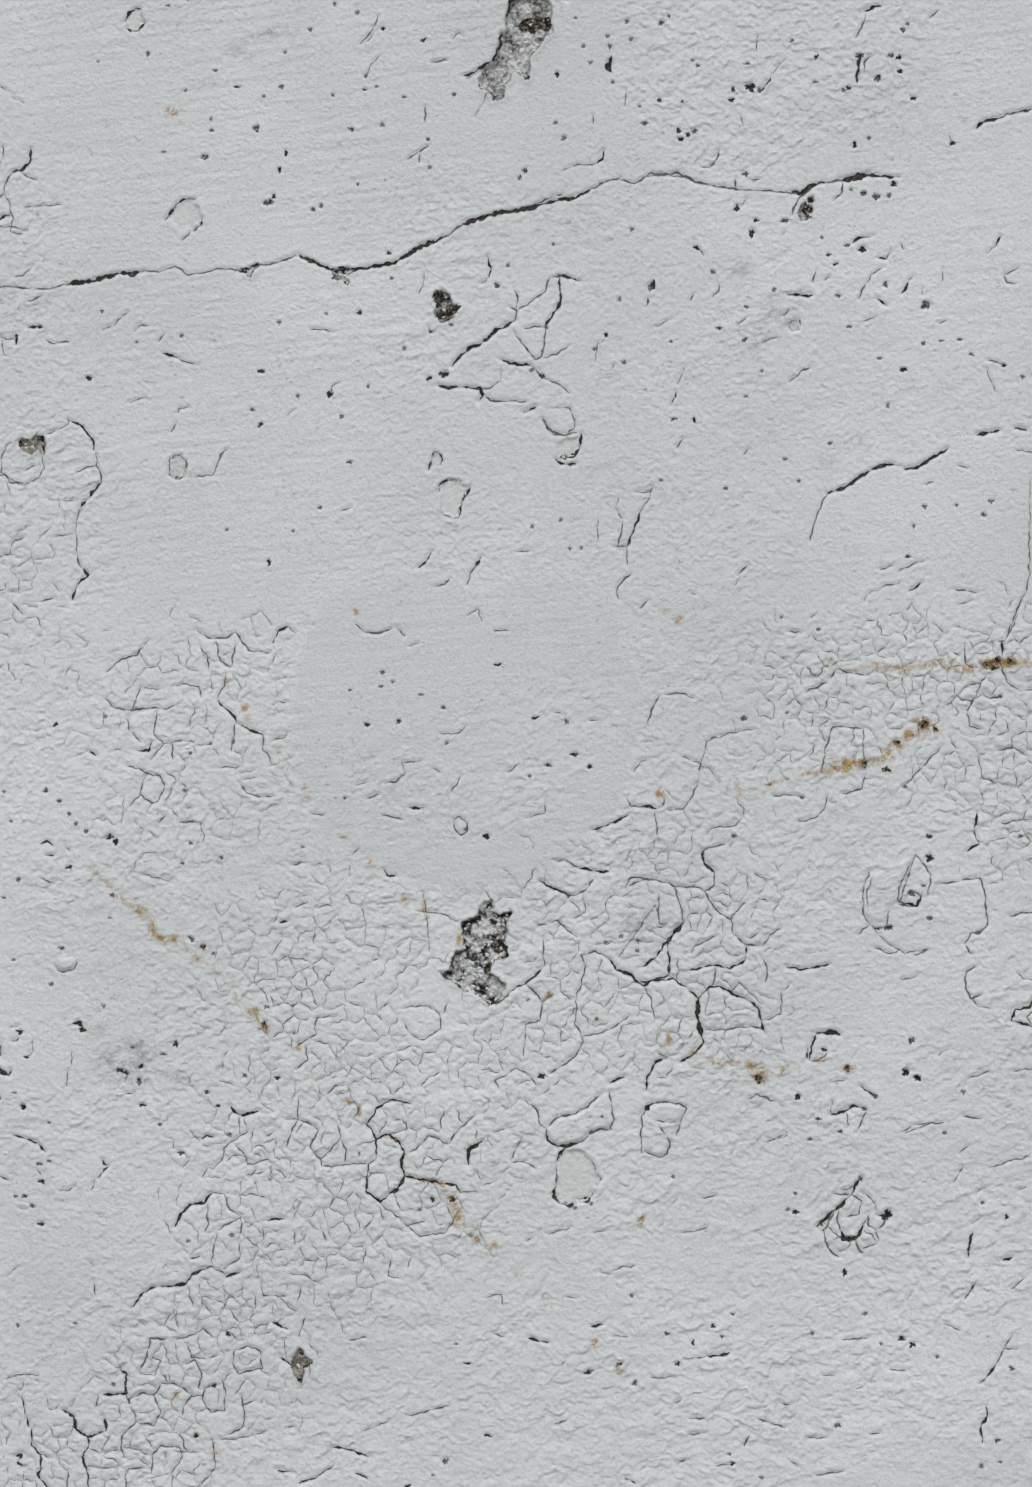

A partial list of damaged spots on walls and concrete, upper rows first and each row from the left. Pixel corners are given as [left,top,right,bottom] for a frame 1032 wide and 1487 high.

spalling [464,0,553,115]
crack [855,5,880,83]
crack [0,95,897,355]
crack [107,313,193,364]
spalling [428,290,461,332]
crack [426,256,614,436]
rust [967,655,1026,672]
rust [807,719,938,774]
spalling [441,900,512,1006]
crack [0,419,1032,1487]
spalling [291,1348,313,1383]